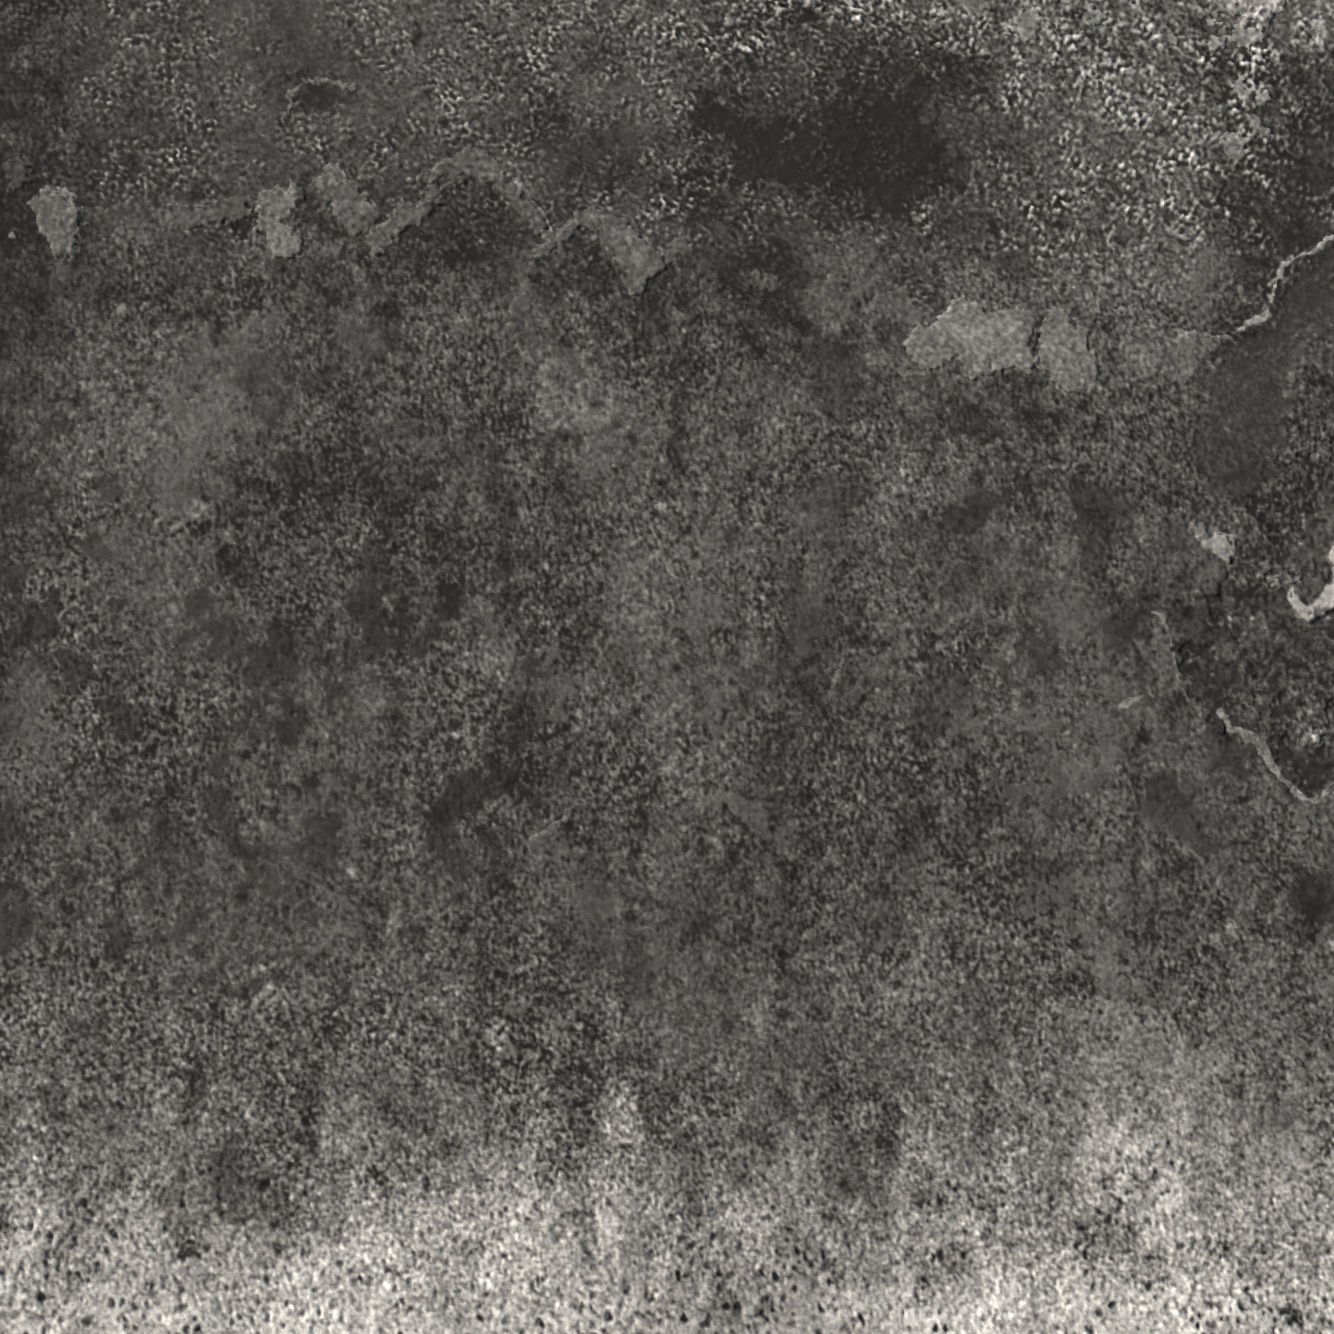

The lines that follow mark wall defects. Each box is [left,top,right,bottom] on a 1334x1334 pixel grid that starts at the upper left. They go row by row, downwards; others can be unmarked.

peeling [3,148,693,340]
peeling [741,269,781,291]
crack [1173,235,1334,340]
peeling [864,287,1102,395]
peeling [1114,324,1212,409]
crack [1289,343,1307,386]
spalling [1144,413,1334,853]